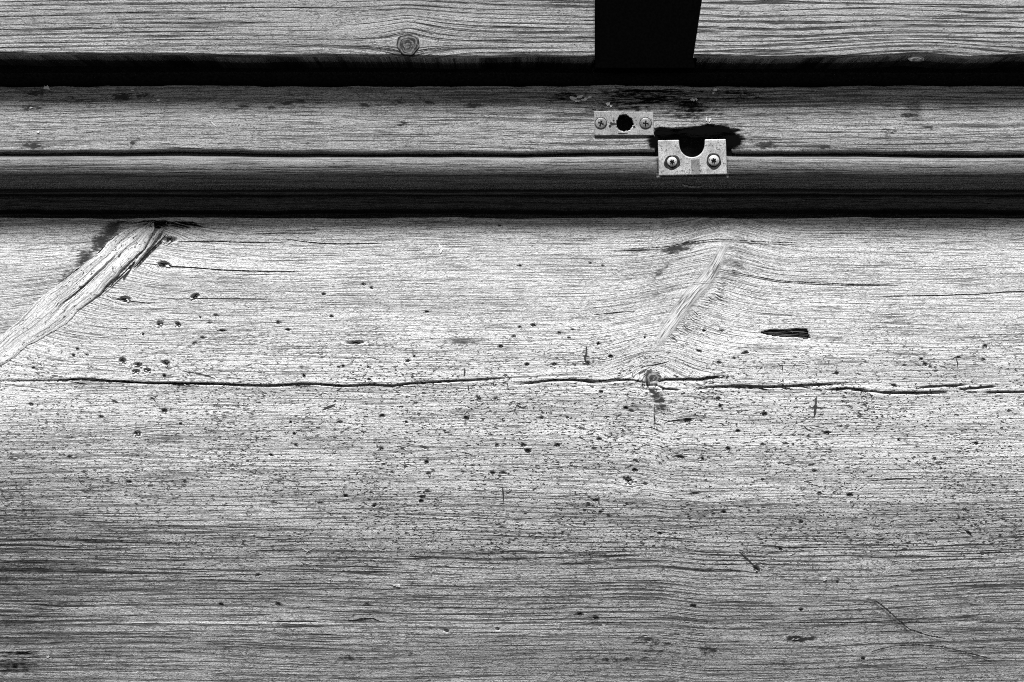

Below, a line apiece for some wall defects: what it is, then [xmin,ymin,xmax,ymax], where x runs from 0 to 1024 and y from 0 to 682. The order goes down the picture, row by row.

crack [5,378,500,387]
crack [530,239,1024,422]